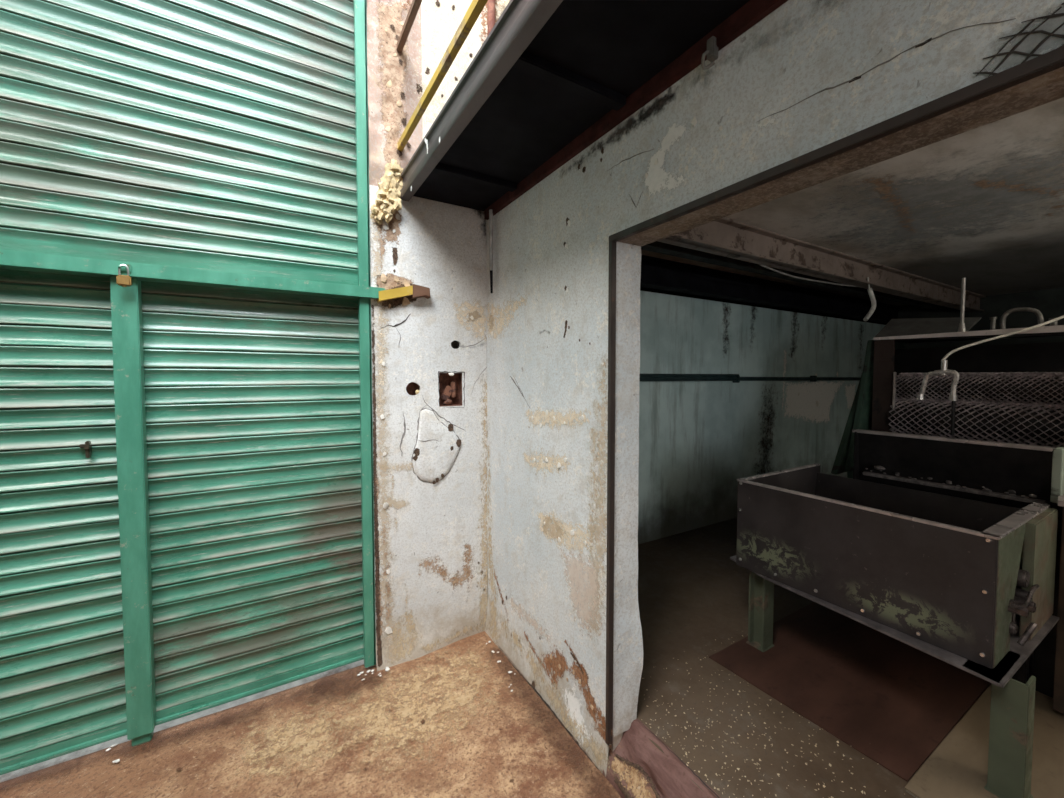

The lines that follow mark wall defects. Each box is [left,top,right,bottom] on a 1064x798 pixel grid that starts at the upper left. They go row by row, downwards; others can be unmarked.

crack [757,18,1016,122]
peeling [642,116,697,197]
flaking render [370,0,484,667]
water stain [755,381,785,474]
water stain [392,362,612,798]
flaking render [524,631,660,798]